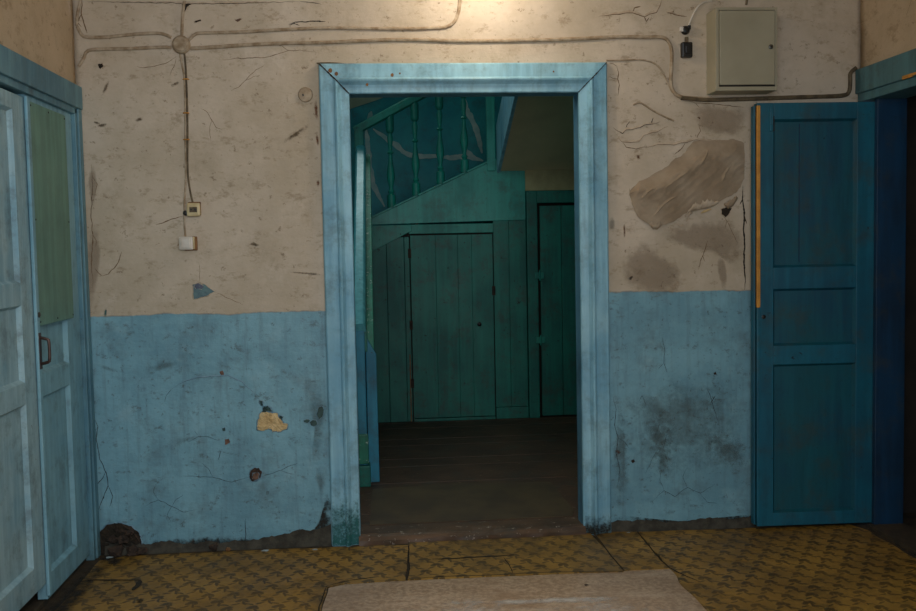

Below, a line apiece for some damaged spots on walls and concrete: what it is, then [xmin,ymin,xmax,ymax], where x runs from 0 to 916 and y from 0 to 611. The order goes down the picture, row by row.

crack [614,119,719,155]
crack [724,191,747,290]
peeling [192,282,215,300]
flaking render [256,400,289,433]
peeling [249,467,263,482]
hole [100,521,149,557]